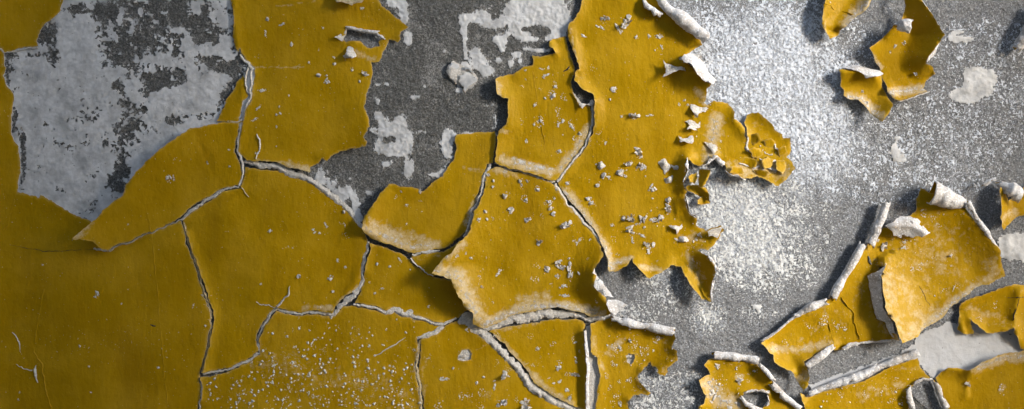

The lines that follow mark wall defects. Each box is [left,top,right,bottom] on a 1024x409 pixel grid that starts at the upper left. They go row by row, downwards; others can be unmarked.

flaking render [1,0,255,222]
crack [13,54,611,409]
flaking render [308,0,582,224]
flaking render [595,0,1024,409]
peeling [584,325,600,409]